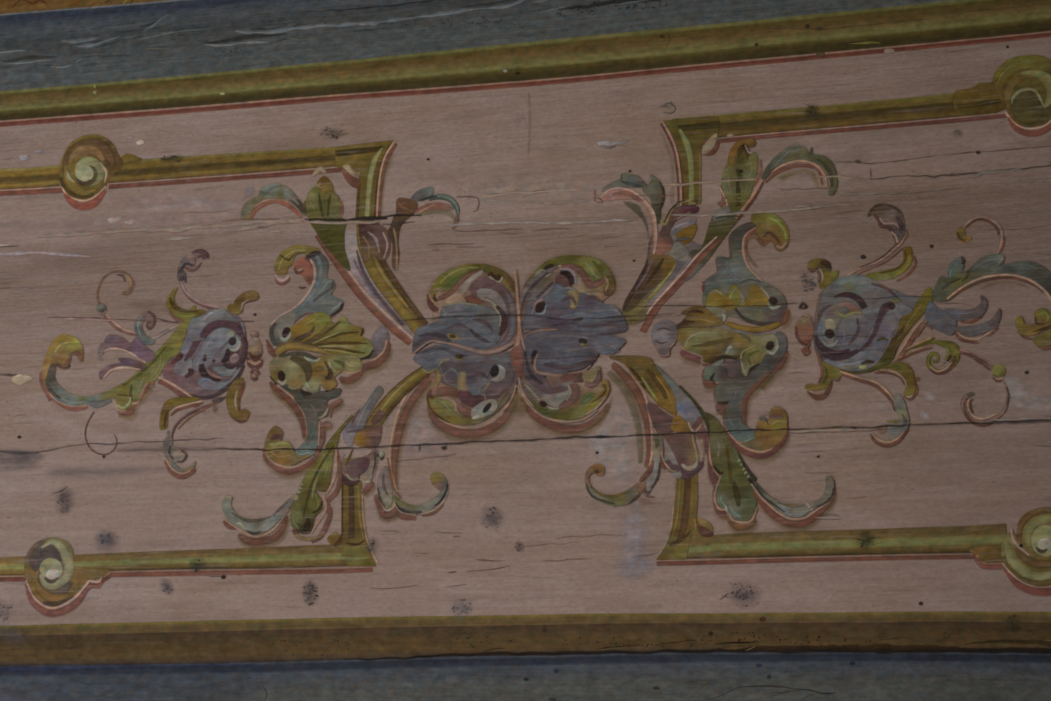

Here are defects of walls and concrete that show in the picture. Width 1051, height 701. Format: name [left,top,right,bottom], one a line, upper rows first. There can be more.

crack [810,146,1051,209]
crack [305,214,422,226]
crack [391,303,793,322]
crack [0,417,1051,473]